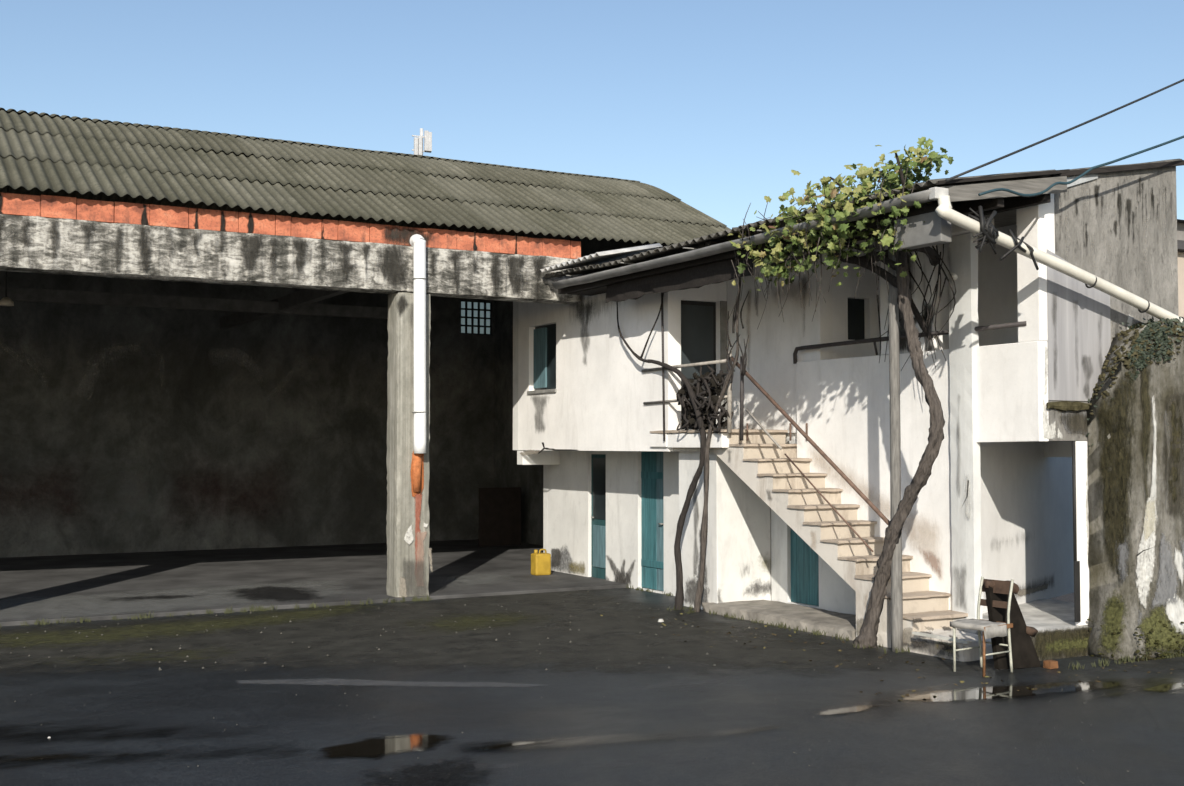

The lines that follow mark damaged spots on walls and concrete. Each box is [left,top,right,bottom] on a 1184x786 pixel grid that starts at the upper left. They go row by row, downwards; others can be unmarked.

water stain [51,221,59,258]
water stain [135,204,150,276]
water stain [193,209,201,255]
water stain [241,213,276,271]
water stain [293,219,324,273]
water stain [339,227,436,322]
water stain [451,251,460,294]
water stain [491,234,545,296]
water stain [1095,178,1172,238]
water stain [1098,353,1151,553]
water stain [1164,393,1184,515]
corrosion [410,451,427,586]